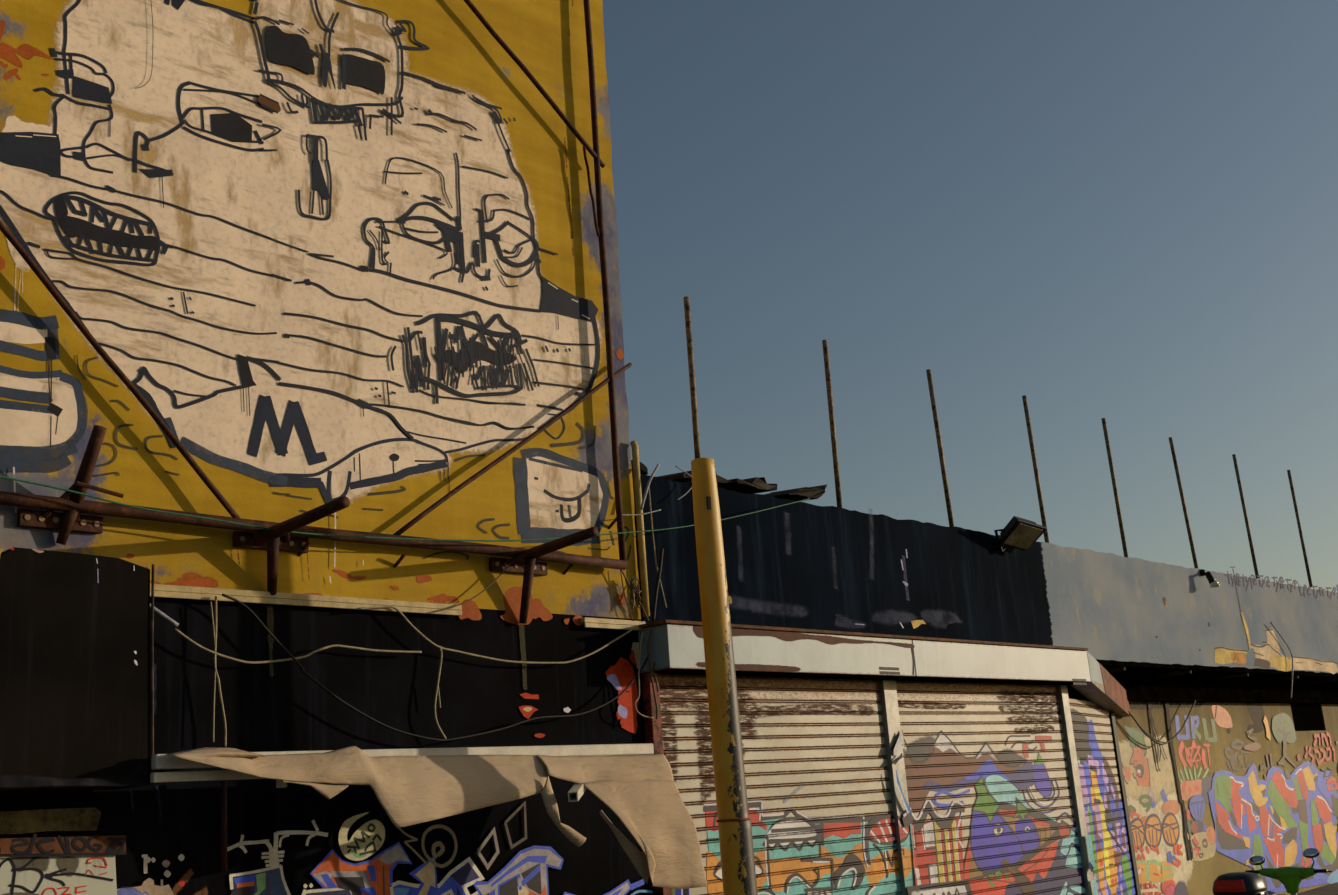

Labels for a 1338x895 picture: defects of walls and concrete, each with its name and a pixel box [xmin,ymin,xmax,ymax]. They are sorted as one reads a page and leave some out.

peeling [500,586,583,626]
rust [693,625,703,638]
rust [731,627,915,675]
flaking render [1199,628,1338,674]
peeling [605,642,639,734]
rust [659,662,715,804]
rust [737,689,874,755]